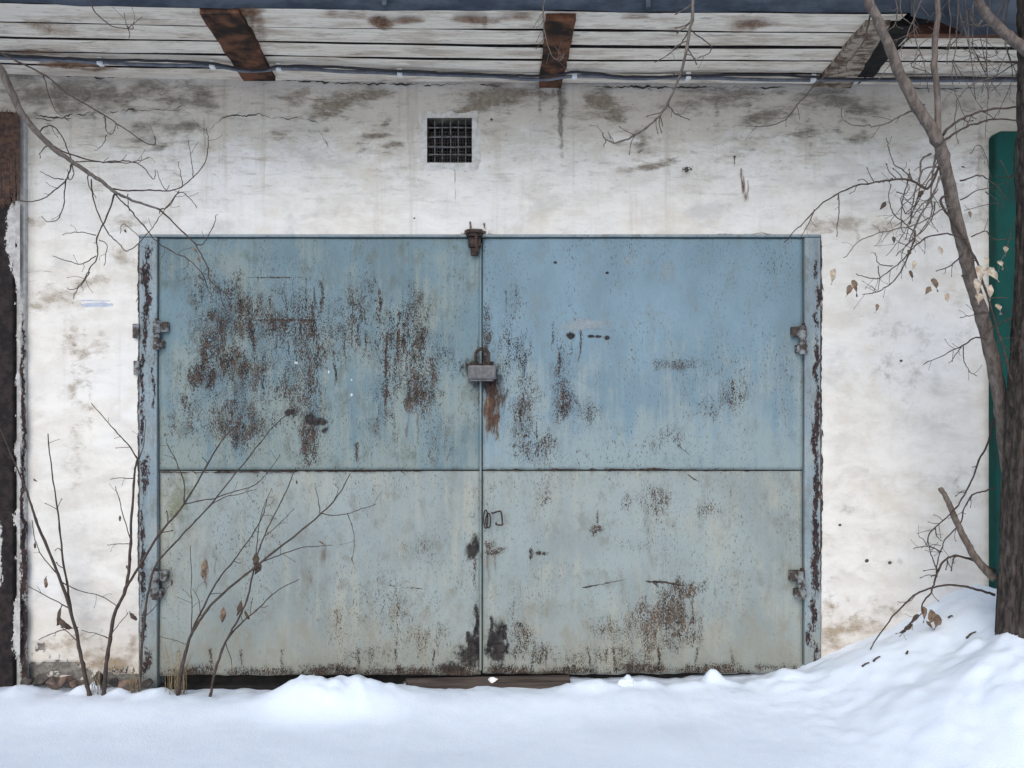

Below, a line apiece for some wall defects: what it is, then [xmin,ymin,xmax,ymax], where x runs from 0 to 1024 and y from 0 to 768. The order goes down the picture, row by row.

water stain [2,74,218,114]
water stain [311,90,390,118]
water stain [363,121,401,150]
water stain [448,84,566,146]
water stain [585,88,623,122]
water stain [803,90,877,115]
peeling [164,259,456,469]
rust [460,285,522,439]
rust [402,371,429,418]
peeling [0,201,163,689]
rust [160,575,797,675]
water stain [827,626,859,648]